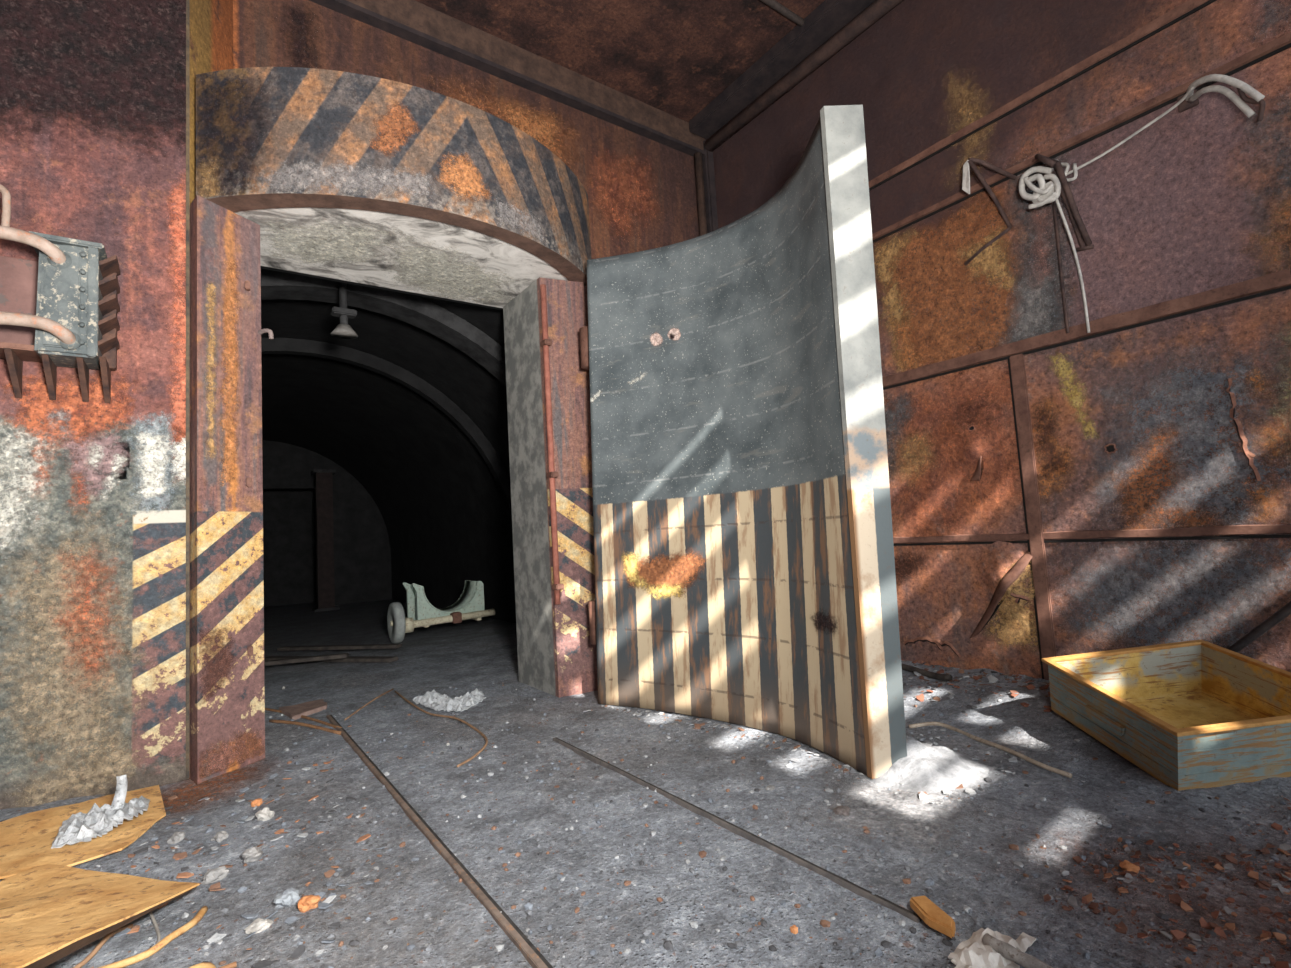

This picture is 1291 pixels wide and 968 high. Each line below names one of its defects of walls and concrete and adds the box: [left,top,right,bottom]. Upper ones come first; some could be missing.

corrosion [371,104,420,156]
corrosion [440,156,490,199]
corrosion [452,88,572,165]
corrosion [874,189,1021,372]
corrosion [167,184,186,480]
corrosion [206,262,239,483]
corrosion [1032,399,1071,497]
corrosion [1112,423,1223,538]
corrosion [987,561,1038,647]